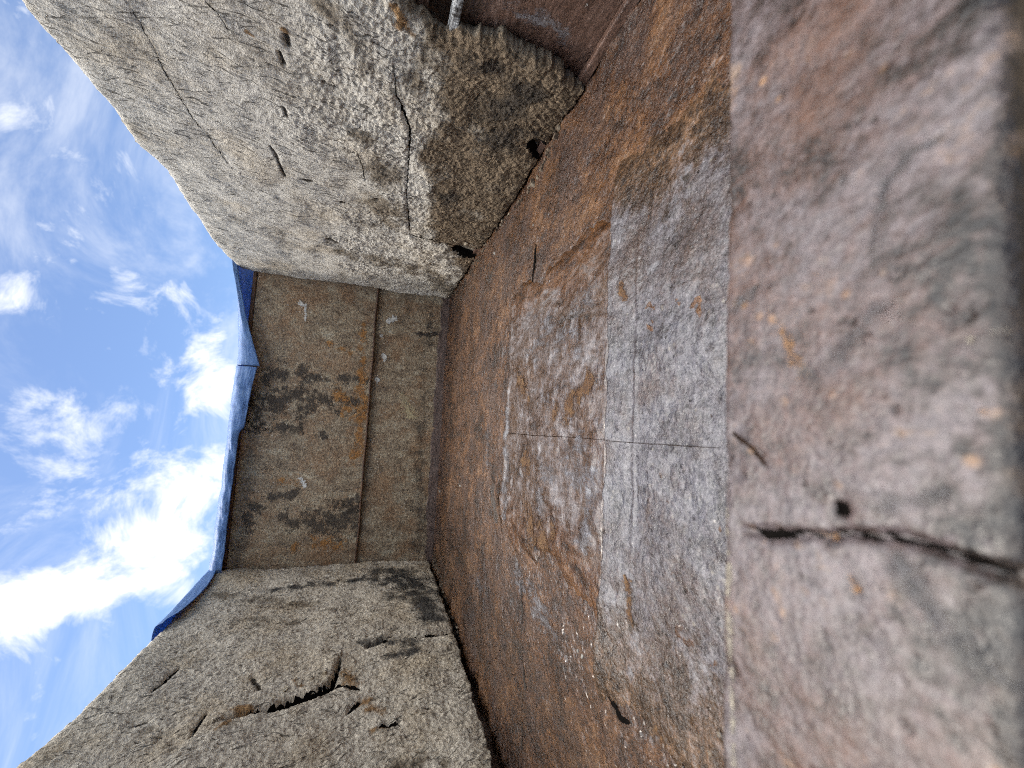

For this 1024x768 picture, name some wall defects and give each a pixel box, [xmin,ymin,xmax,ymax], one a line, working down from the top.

crack [394,74,468,246]
corrosion [326,322,368,459]
corrosion [552,367,602,425]
crack [510,432,767,468]
crack [749,527,1020,574]
crack [239,663,360,718]
crack [379,721,398,729]
crack [608,697,630,725]